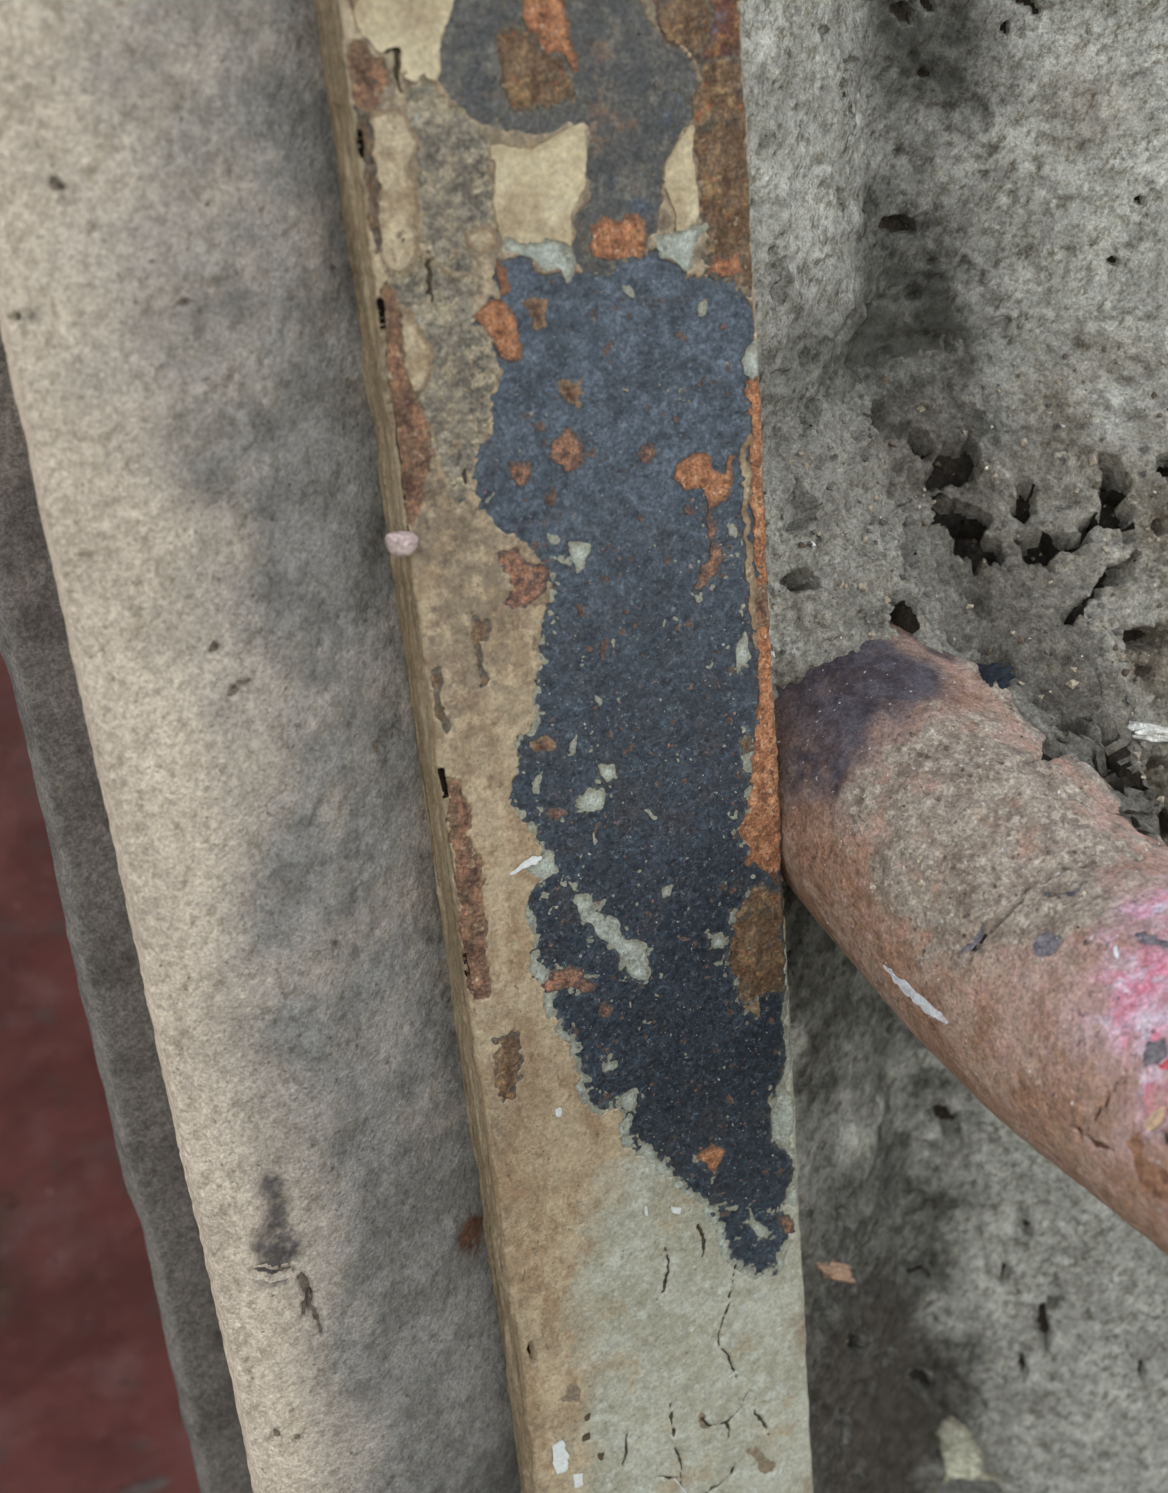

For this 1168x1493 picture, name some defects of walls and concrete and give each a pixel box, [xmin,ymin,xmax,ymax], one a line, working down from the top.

corrosion [589,213,647,263]
corrosion [631,0,754,313]
peeling [354,0,797,1280]
corrosion [673,376,787,1009]
spalling [976,662,1015,689]
corrosion [446,777,493,1001]
crack [621,1434,629,1465]
crack [656,1224,769,1493]